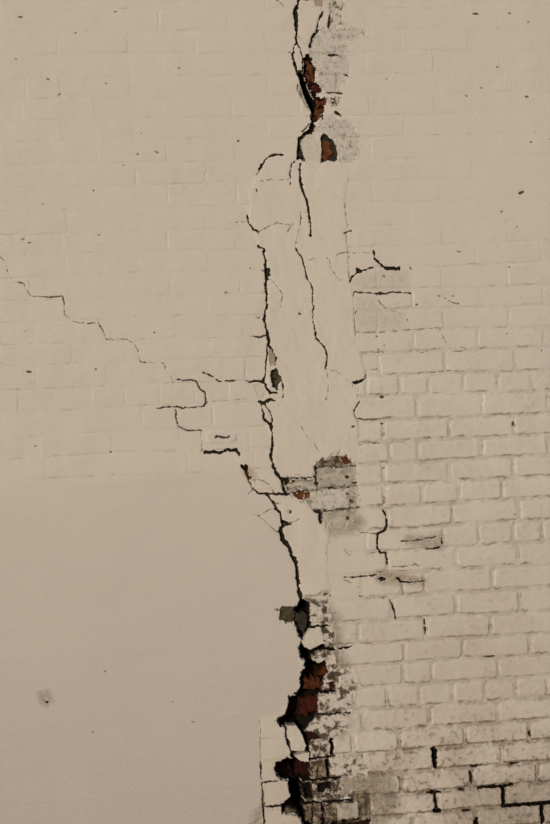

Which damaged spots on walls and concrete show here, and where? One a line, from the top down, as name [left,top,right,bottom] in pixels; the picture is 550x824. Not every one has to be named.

crack [276,0,324,74]
spalling [296,0,361,164]
crack [0,153,466,600]
spalling [283,450,361,528]
crack [344,509,443,620]
spalling [272,589,373,824]
crack [259,721,288,824]